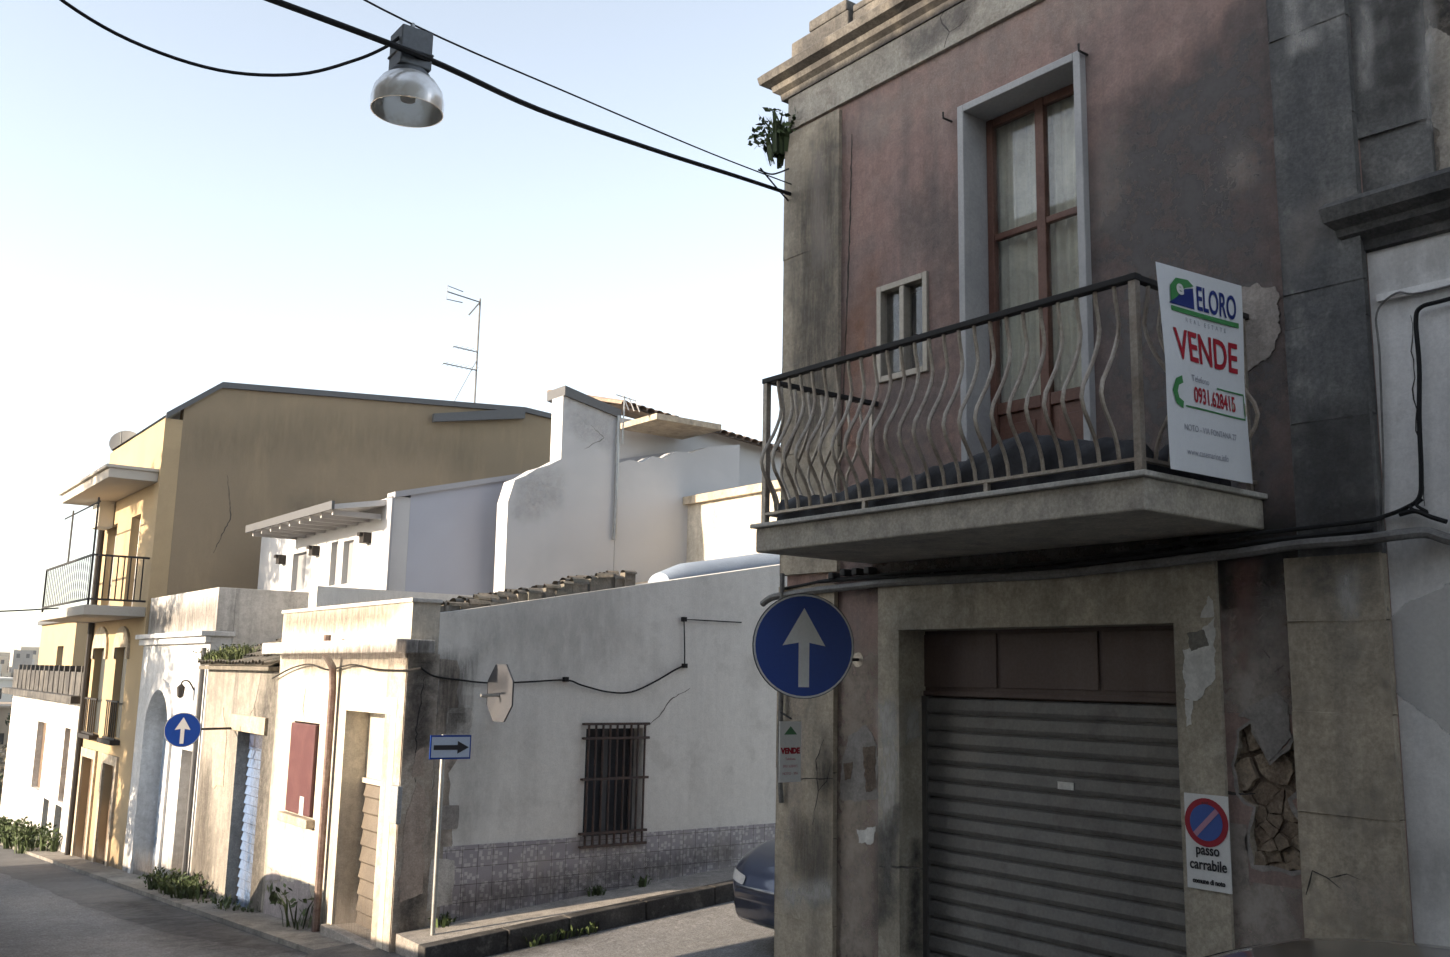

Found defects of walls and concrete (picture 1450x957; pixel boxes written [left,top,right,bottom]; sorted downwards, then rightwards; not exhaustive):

flaking render [1182,570,1302,949]